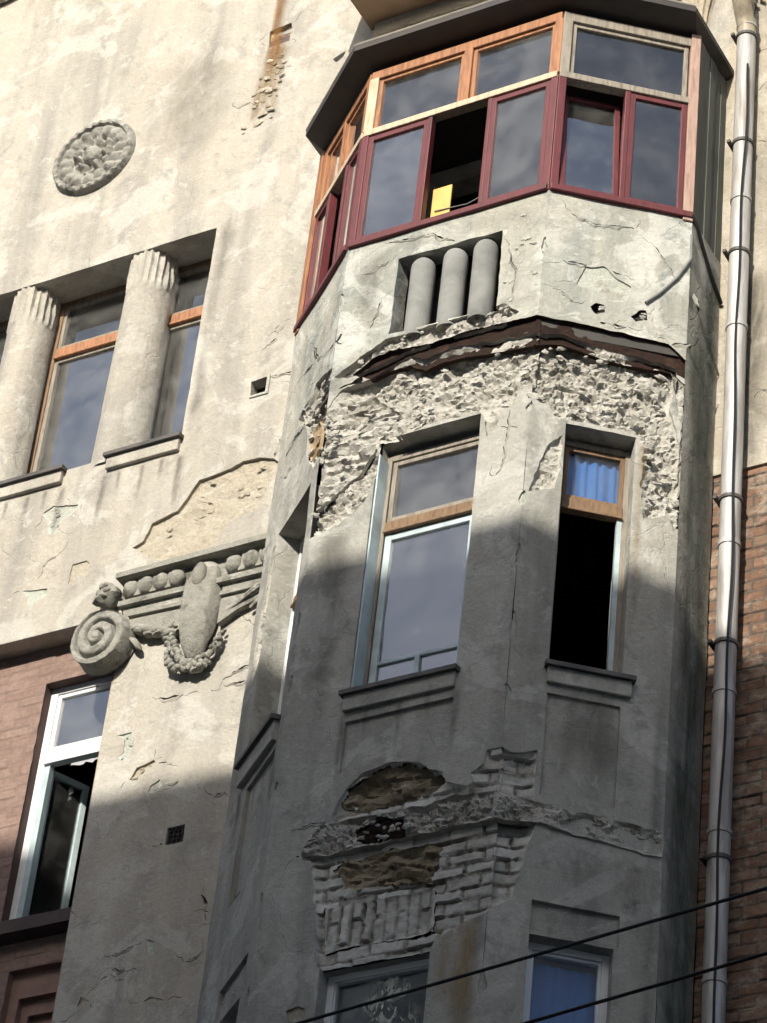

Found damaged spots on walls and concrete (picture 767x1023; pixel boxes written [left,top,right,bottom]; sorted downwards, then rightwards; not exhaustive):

spalling [240,23,292,134]
crack [546,260,587,304]
crack [562,199,700,349]
spalling [298,214,684,536]
crack [490,412,514,475]
peeling [133,457,278,560]
flaking render [303,746,538,971]
crack [174,886,212,963]
crack [61,943,140,1022]